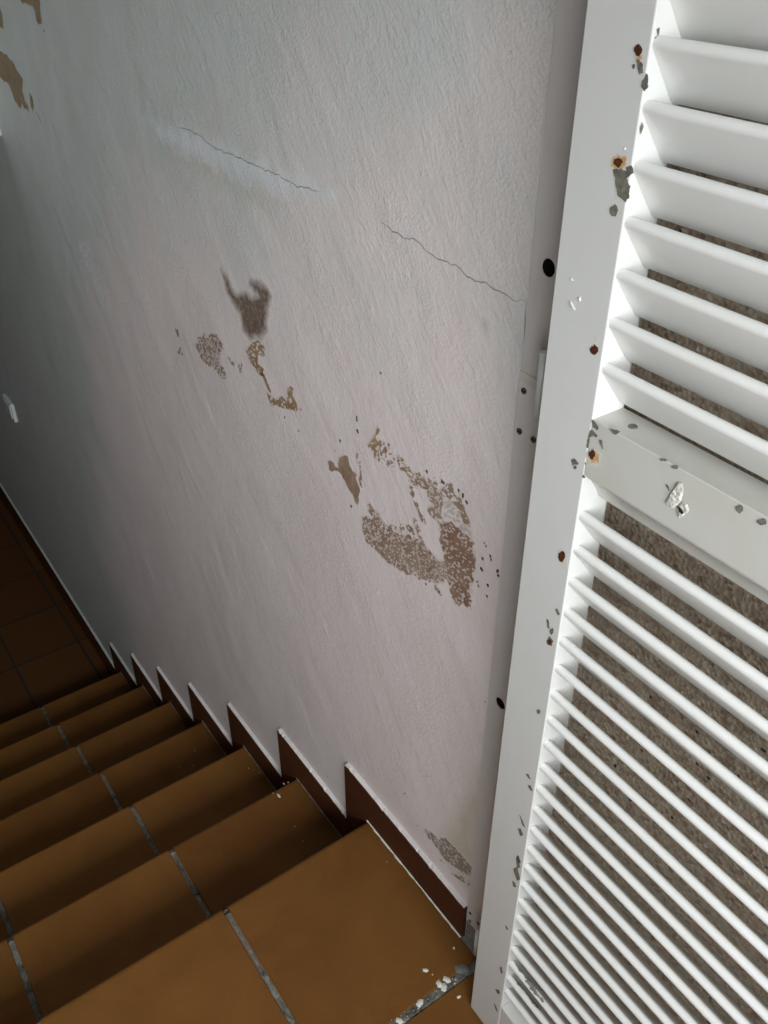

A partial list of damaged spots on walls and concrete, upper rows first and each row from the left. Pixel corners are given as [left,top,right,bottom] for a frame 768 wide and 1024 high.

peeling [20,0,45,33]
peeling [0,50,41,122]
crack [177,126,320,192]
damp [219,266,273,343]
crack [381,222,526,336]
peeling [194,333,302,418]
peeling [327,426,499,611]
peeling [424,828,472,885]